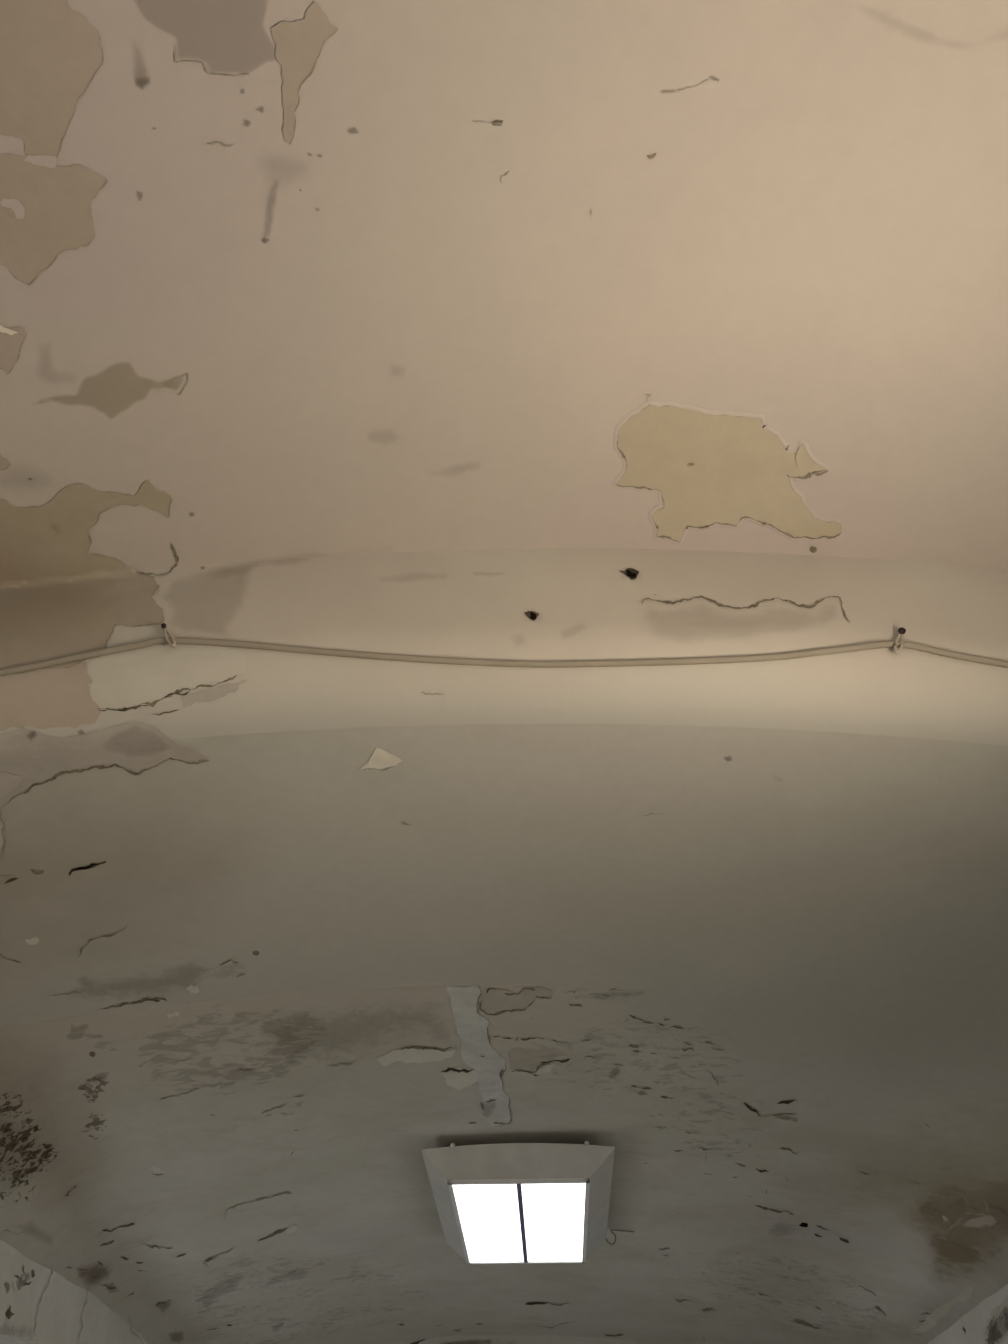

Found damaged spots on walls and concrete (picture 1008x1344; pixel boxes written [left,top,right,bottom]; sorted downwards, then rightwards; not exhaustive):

peeling [0,0,108,285]
peeling [270,1,338,145]
peeling [0,326,27,375]
peeling [612,394,846,553]
peeling [0,480,172,669]
peeling [0,720,209,863]
peeling [377,1046,457,1066]
peeling [479,987,553,1016]
damp [0,1093,57,1203]
crack [754,1205,793,1215]